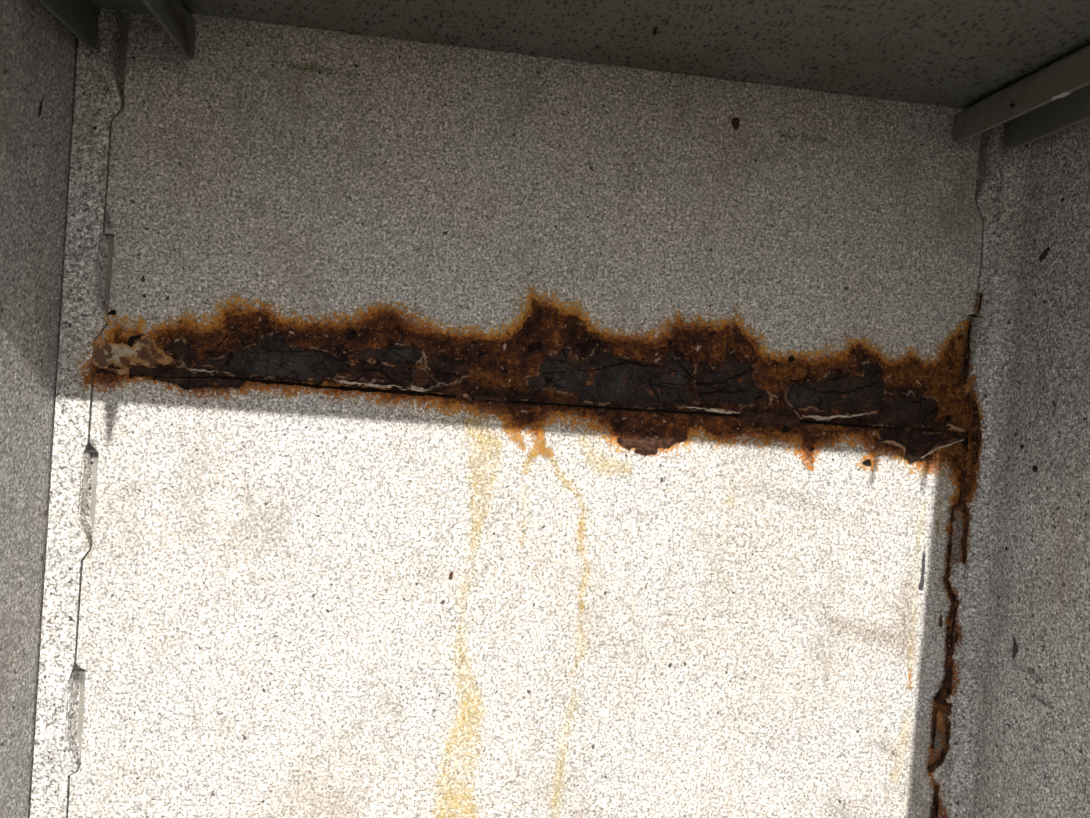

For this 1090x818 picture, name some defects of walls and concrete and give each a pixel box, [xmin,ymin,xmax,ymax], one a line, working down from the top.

rust [76,280,985,818]